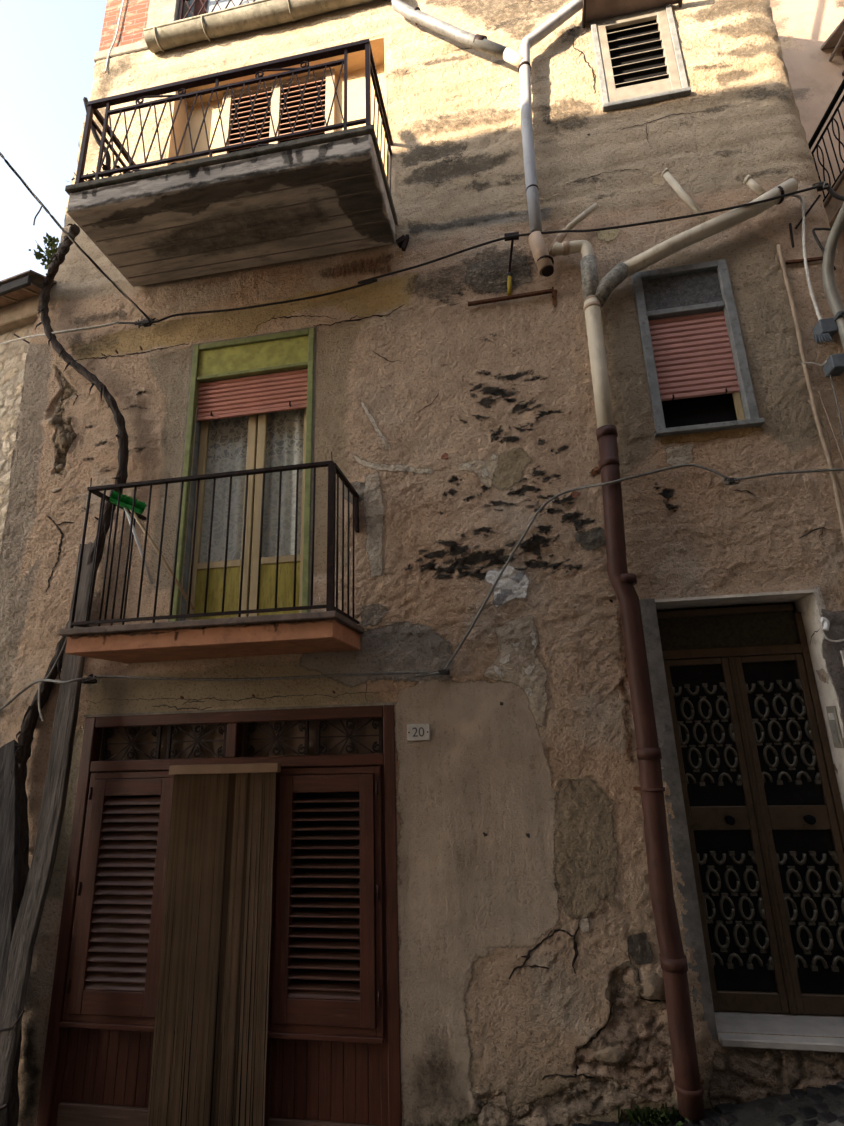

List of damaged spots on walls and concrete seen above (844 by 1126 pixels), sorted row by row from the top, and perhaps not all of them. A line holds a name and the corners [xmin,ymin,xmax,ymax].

damp [426,0,565,40]
damp [691,0,808,100]
damp [401,108,522,192]
damp [542,98,591,143]
damp [69,135,396,249]
damp [408,212,515,234]
spalling [48,368,92,504]
peeling [441,453,499,487]
crack [46,516,74,592]
crack [509,919,581,979]
spalling [605,961,666,1005]